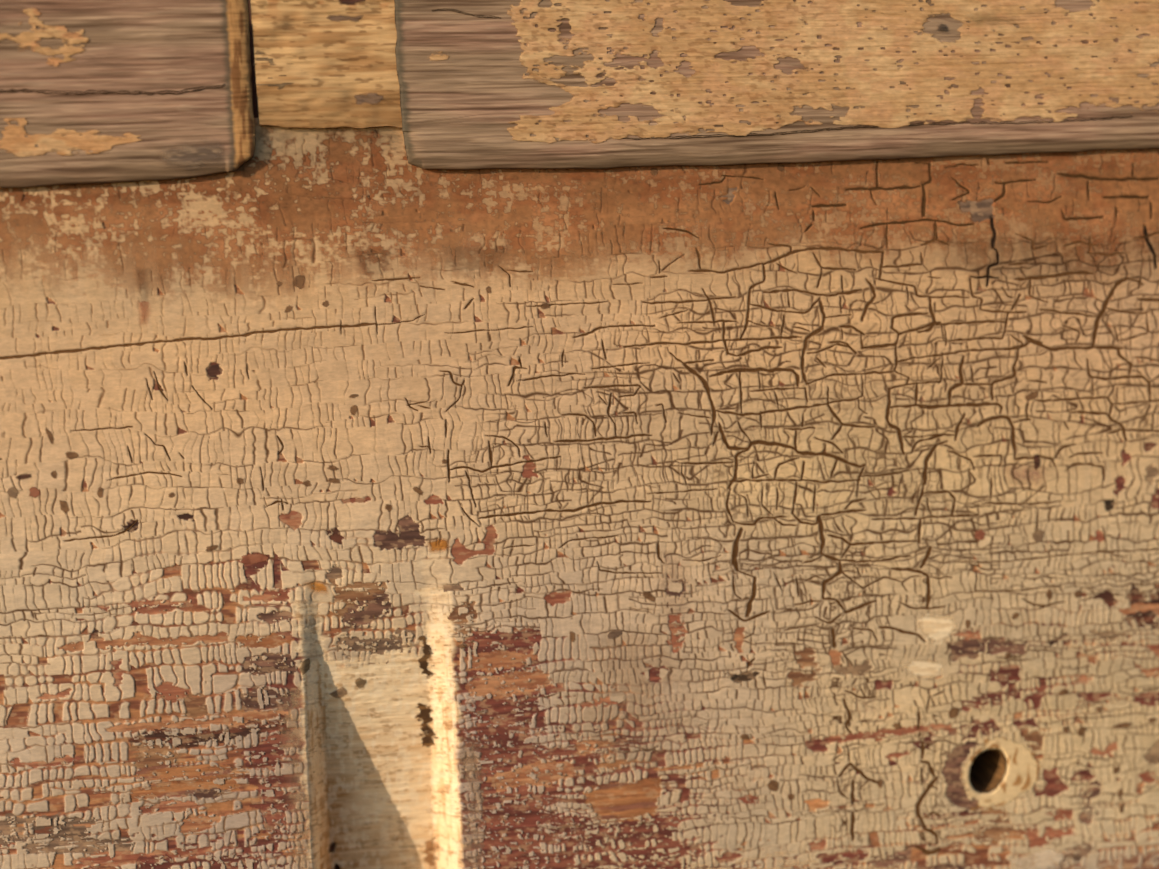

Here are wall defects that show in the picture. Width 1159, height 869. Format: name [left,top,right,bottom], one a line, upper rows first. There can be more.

peeling [507,0,1159,144]
crack [623,116,1133,140]
crack [0,159,1159,668]
peeling [240,553,269,578]
peeling [0,817,261,869]
peeling [59,591,310,834]
peeling [443,585,575,869]
peeling [571,780,687,869]
crack [833,687,878,840]
crack [916,691,945,855]
peeling [805,620,1111,842]
peeling [1029,768,1159,869]